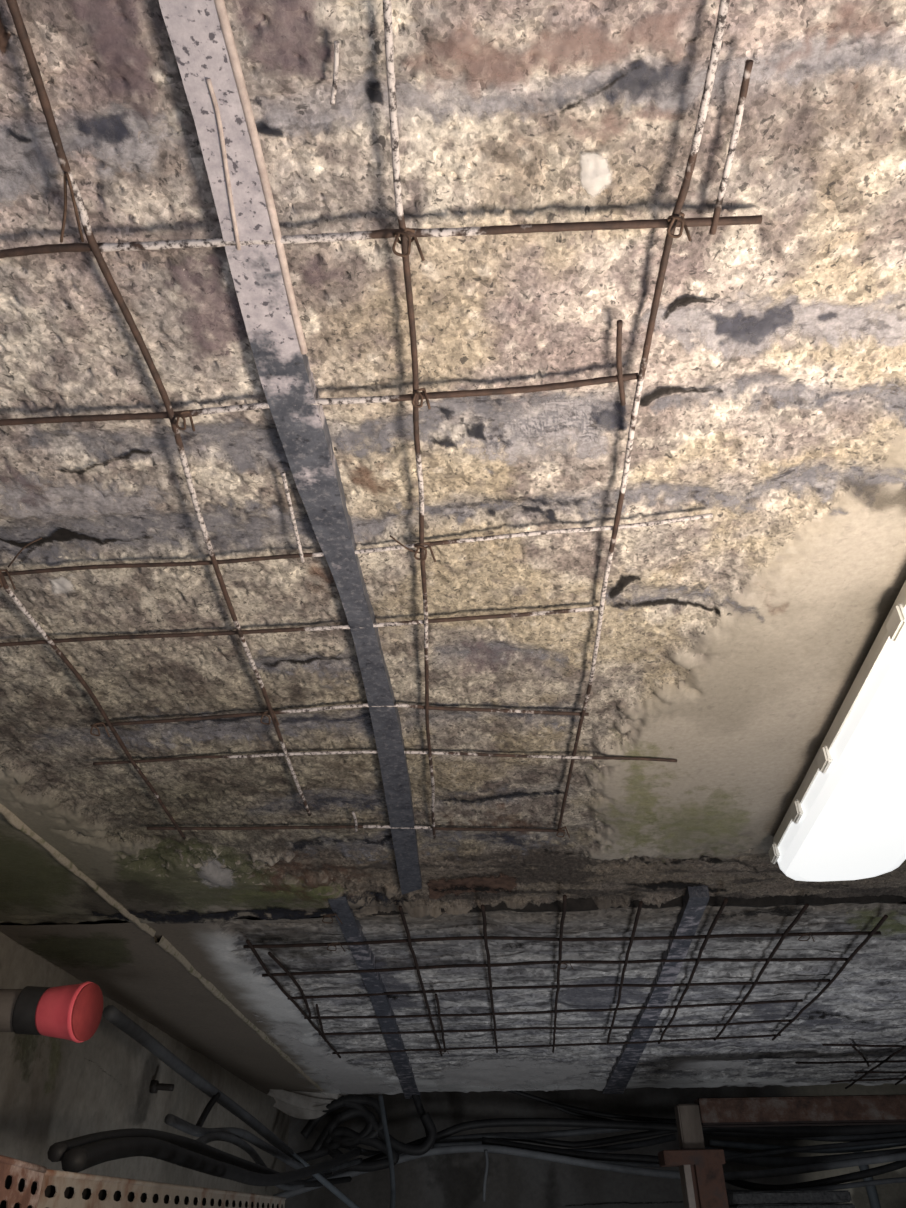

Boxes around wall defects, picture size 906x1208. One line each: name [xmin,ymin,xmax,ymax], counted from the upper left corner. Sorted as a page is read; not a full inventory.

rust [74,0,154,94]
rust [235,0,334,74]
rust [426,16,678,86]
rust [173,258,248,351]
spalling [0,0,762,839]
crack [639,387,723,407]
spalling [576,0,906,756]
crack [56,450,159,475]
crack [0,529,153,561]
crack [609,576,721,617]
crack [264,658,342,667]
spalling [0,644,906,1119]